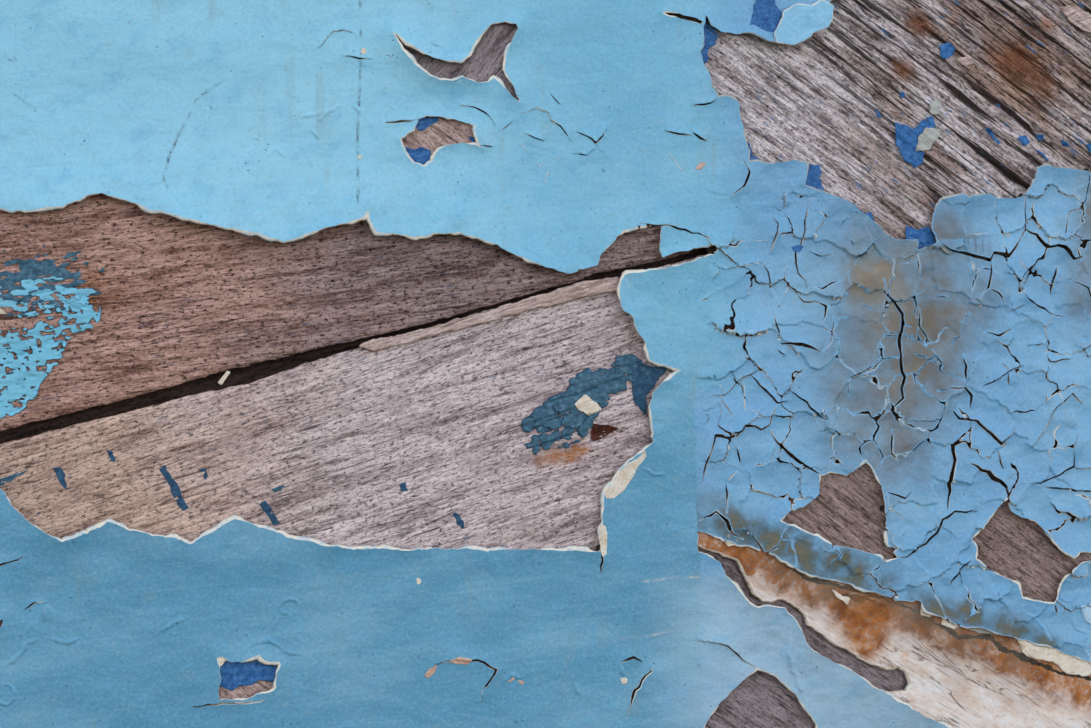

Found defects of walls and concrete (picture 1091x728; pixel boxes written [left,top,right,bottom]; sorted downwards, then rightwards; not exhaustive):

peeling [393,21,520,102]
crack [457,93,604,156]
crack [734,161,751,206]
peeling [663,0,1091,250]
peeling [0,193,716,557]
crack [0,168,1091,691]
peeling [781,449,902,568]
peeling [972,488,1091,610]
crack [436,659,498,701]
crack [621,656,652,714]
corrosion [697,531,1091,705]
peeling [697,530,1091,728]